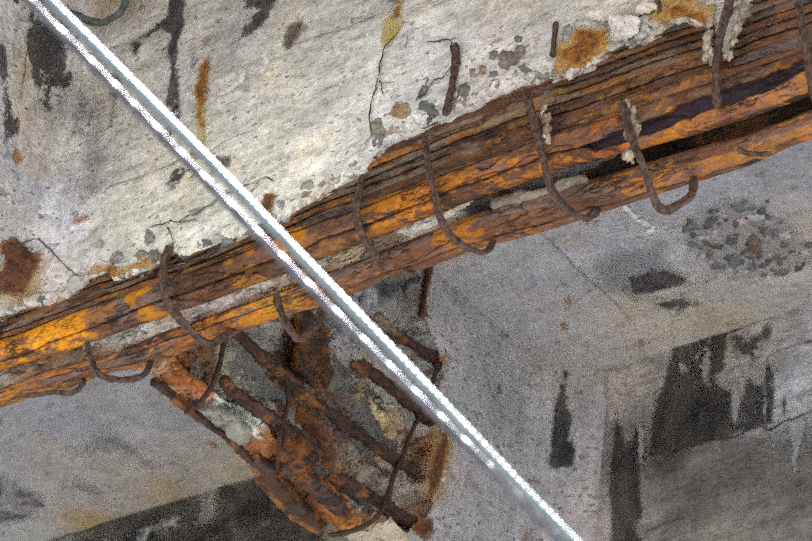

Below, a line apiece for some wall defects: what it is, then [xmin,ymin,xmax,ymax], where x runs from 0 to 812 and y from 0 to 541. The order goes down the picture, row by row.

leakage [27,12,72,112]
leakage [130,0,187,121]
rust [554,28,609,76]
spalling [306,78,454,206]
spalling [579,96,812,180]
rust [0,237,41,297]
crack [5,238,80,277]
crack [148,176,273,247]
rust [260,193,278,216]
spalling [0,267,312,396]
spalling [132,308,450,531]
leakage [609,326,806,541]